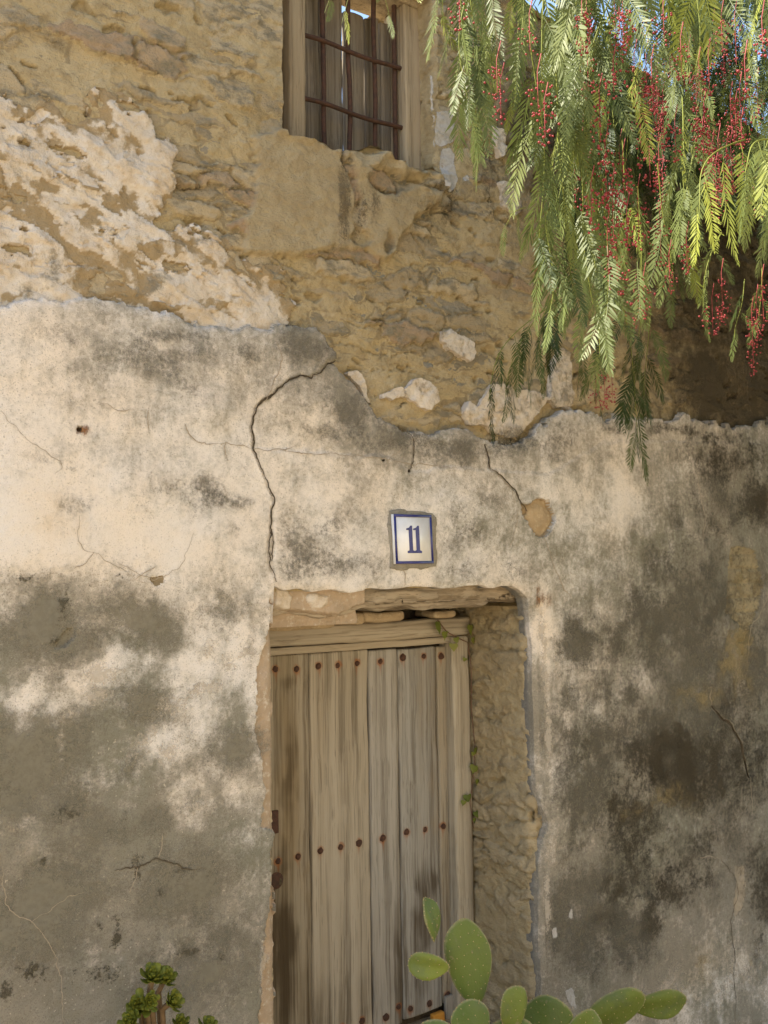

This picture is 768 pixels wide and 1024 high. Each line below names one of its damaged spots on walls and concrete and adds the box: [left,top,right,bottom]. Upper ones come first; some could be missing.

flaking render [0,0,768,445]
crack [74,516,194,583]
crack [184,340,456,582]
crack [483,444,527,545]
spalling [521,497,554,537]
leakage [685,426,768,524]
leakage [99,594,177,645]
leakage [209,590,243,622]
leakage [539,550,768,978]
crack [710,693,753,813]
leakage [0,665,231,983]
crack [115,834,205,894]